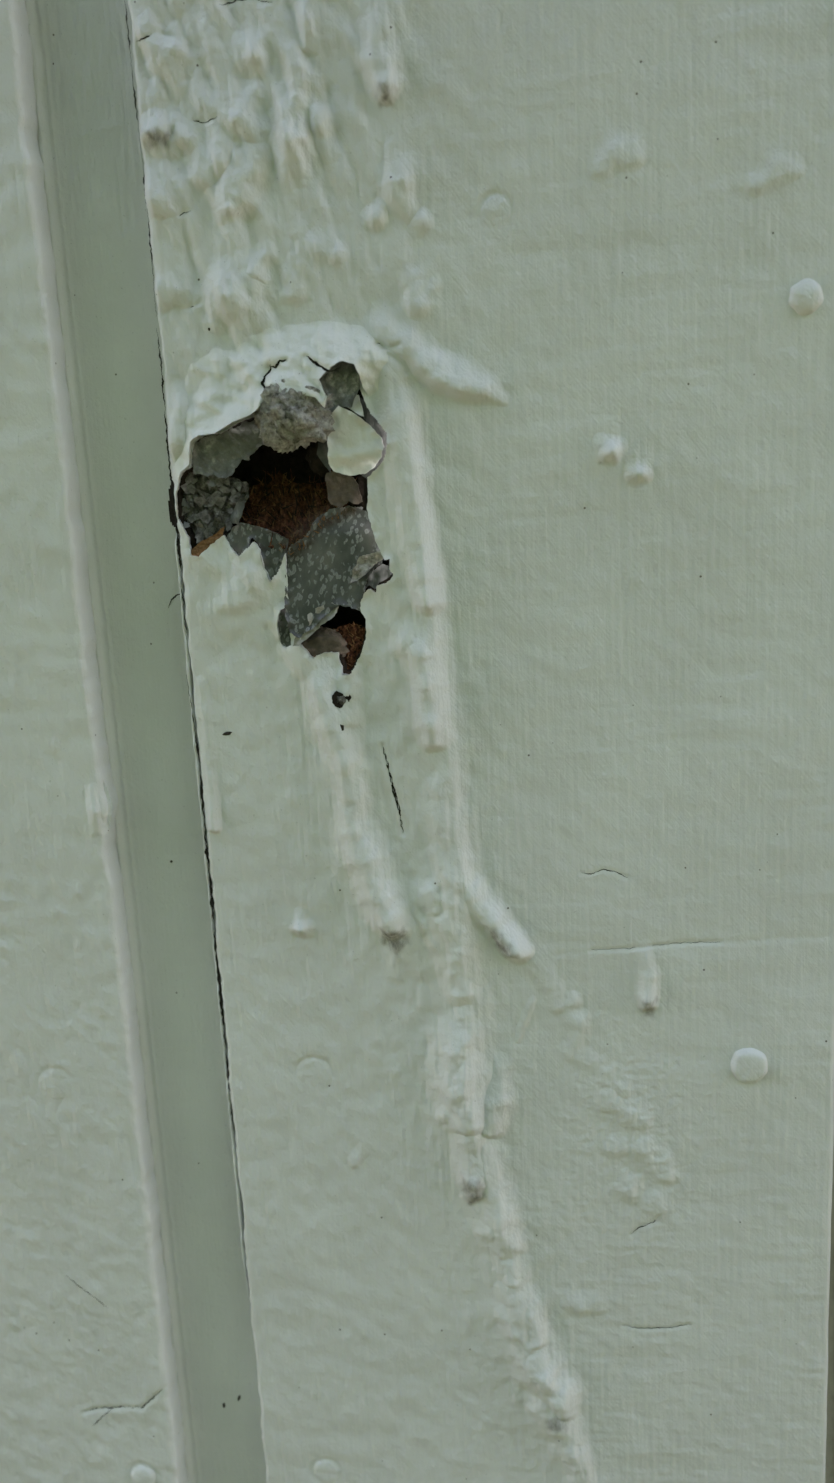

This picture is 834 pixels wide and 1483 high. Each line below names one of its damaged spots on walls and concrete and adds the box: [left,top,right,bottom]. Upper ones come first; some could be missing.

peeling [168,321,393,674]
peeling [332,691,351,731]